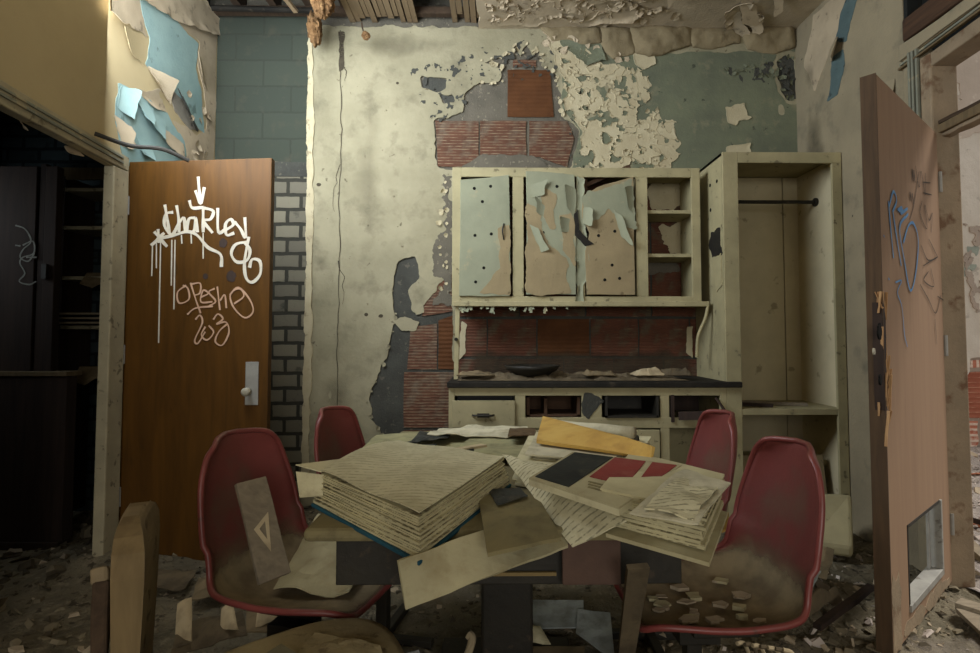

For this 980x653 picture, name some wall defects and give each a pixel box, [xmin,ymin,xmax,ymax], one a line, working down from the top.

peeling [110,0,220,165]
spalling [956,51,980,110]
spalling [364,0,857,444]
spalling [872,301,888,411]
spalling [959,125,980,447]